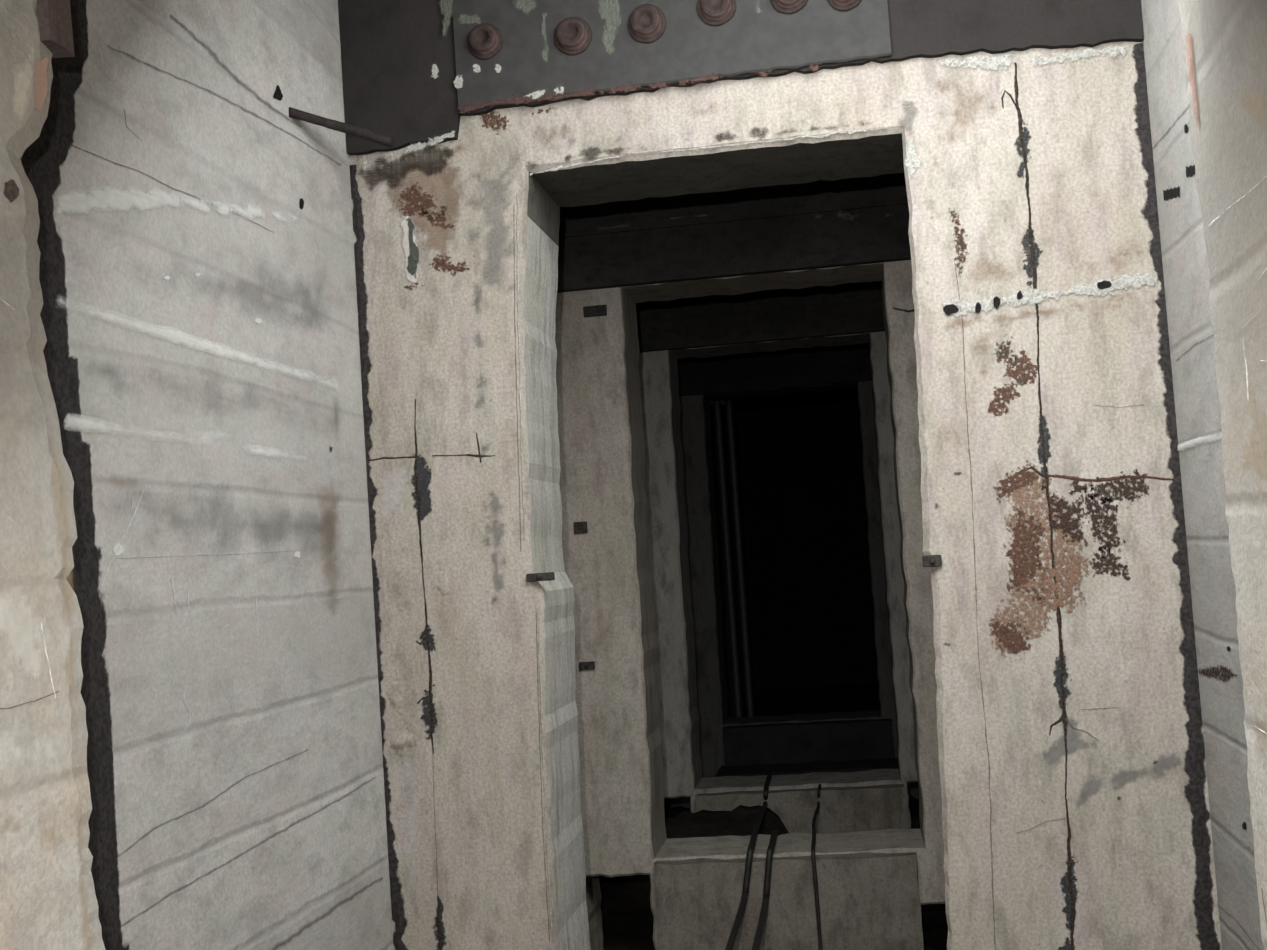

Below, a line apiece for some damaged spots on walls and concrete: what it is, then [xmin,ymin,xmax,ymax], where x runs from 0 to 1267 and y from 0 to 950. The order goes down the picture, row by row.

corrosion [398,182,455,230]
corrosion [430,254,470,275]
corrosion [987,334,1038,417]
crack [954,62,1174,950]
corrosion [986,460,1149,658]
crack [369,399,495,950]